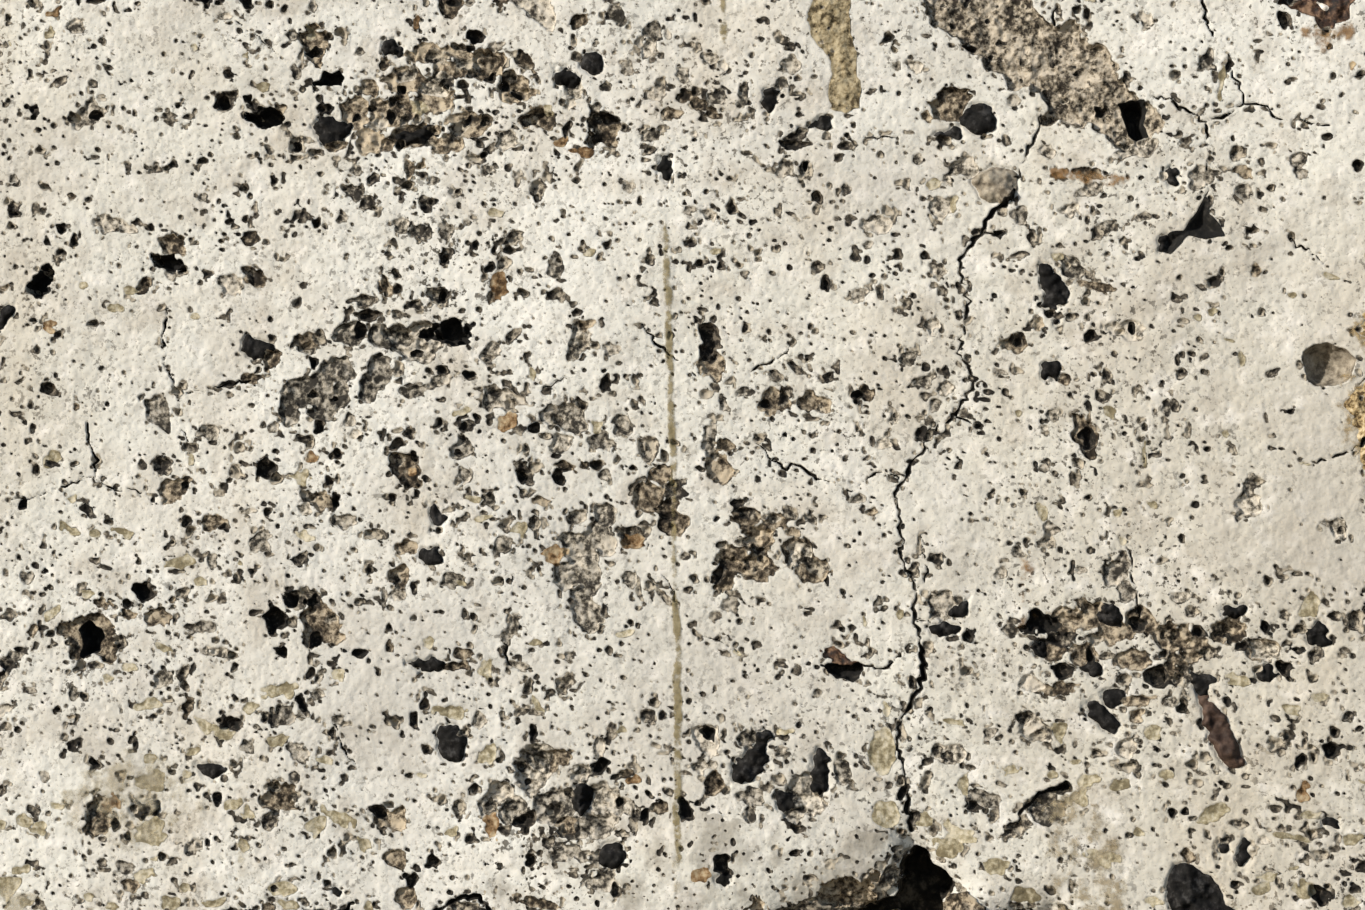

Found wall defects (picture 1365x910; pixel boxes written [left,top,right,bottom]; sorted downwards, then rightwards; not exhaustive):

rust [1301,6,1354,51]
spalling [154,92,208,136]
crack [1153,0,1330,196]
spalling [1352,159,1364,172]
spalling [289,281,307,312]
spalling [1171,292,1199,333]
spalling [1264,405,1317,471]
crack [752,97,1052,832]
spalling [1138,496,1199,543]
crack [1017,784,1067,824]
crack [433,893,492,910]
spalling [1223,866,1299,910]